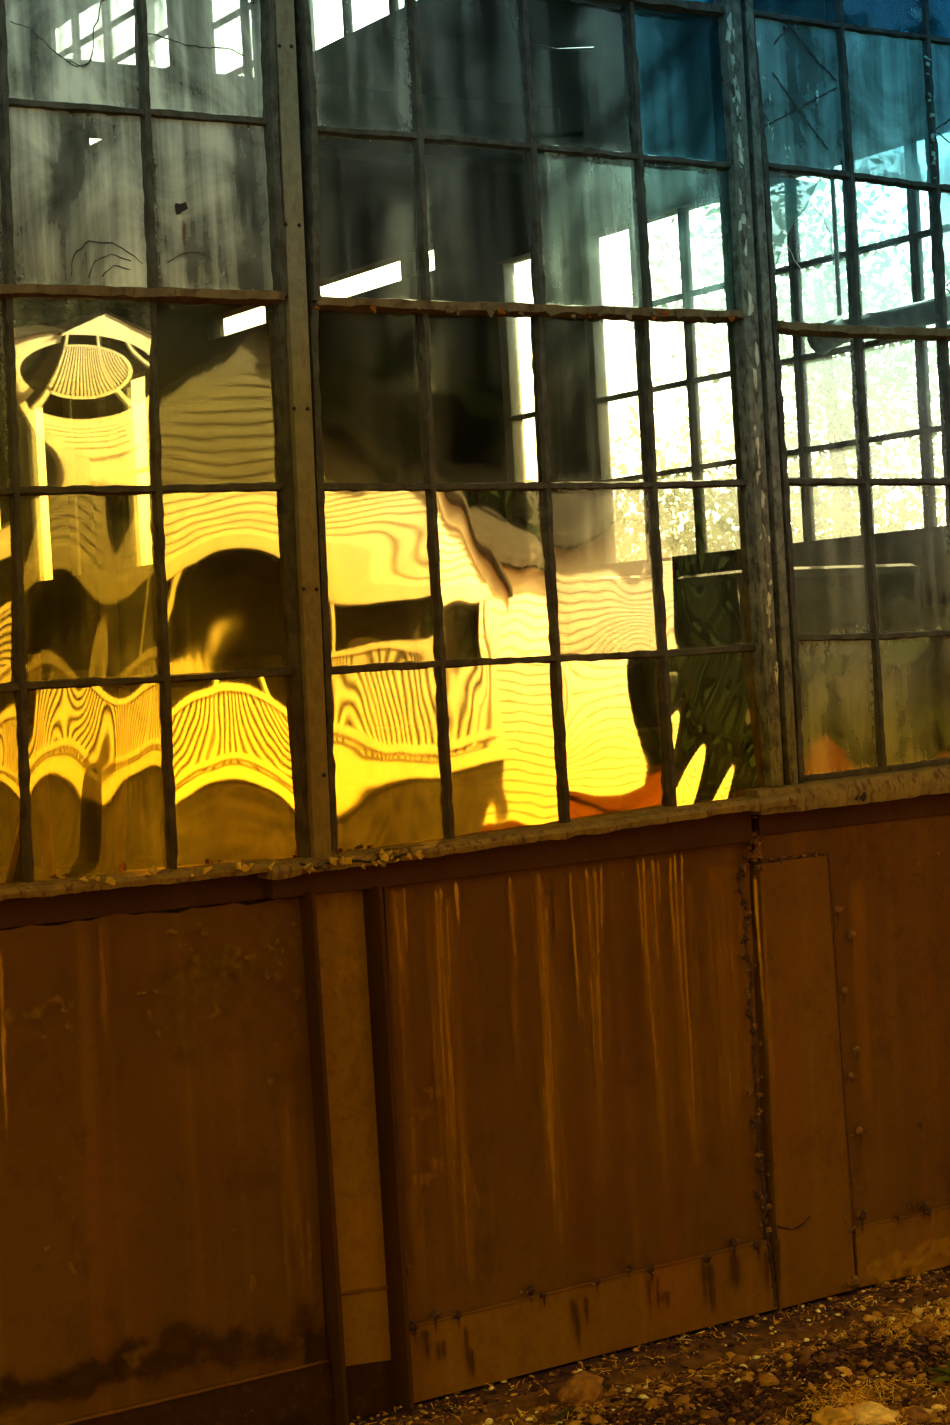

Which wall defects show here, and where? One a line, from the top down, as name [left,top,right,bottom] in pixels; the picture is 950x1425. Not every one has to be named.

corrosion [392,886,407,1020]
corrosion [432,881,470,1256]
corrosion [508,878,516,959]
corrosion [535,874,559,1202]
corrosion [570,867,603,1120]
corrosion [636,853,694,1132]
corrosion [729,816,867,1307]
leakage [0,1307,329,1412]